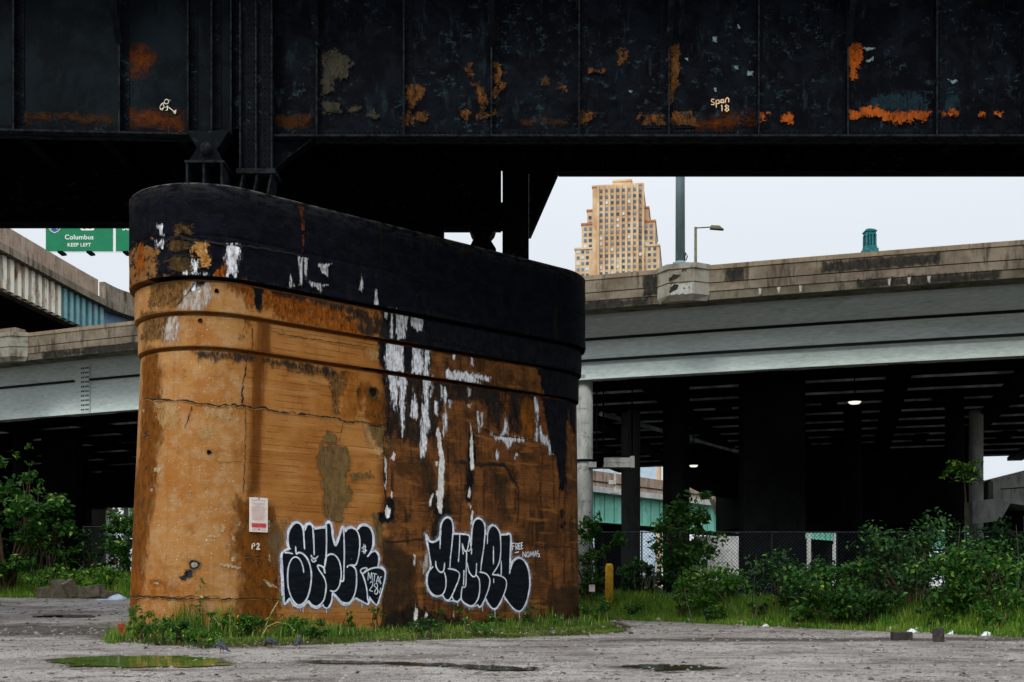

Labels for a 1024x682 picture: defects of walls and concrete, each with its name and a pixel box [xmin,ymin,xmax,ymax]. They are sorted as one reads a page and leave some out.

peeling [320,47,380,119]
spalling [140,221,211,343]
crack [142,327,392,502]
spalling [316,429,374,523]